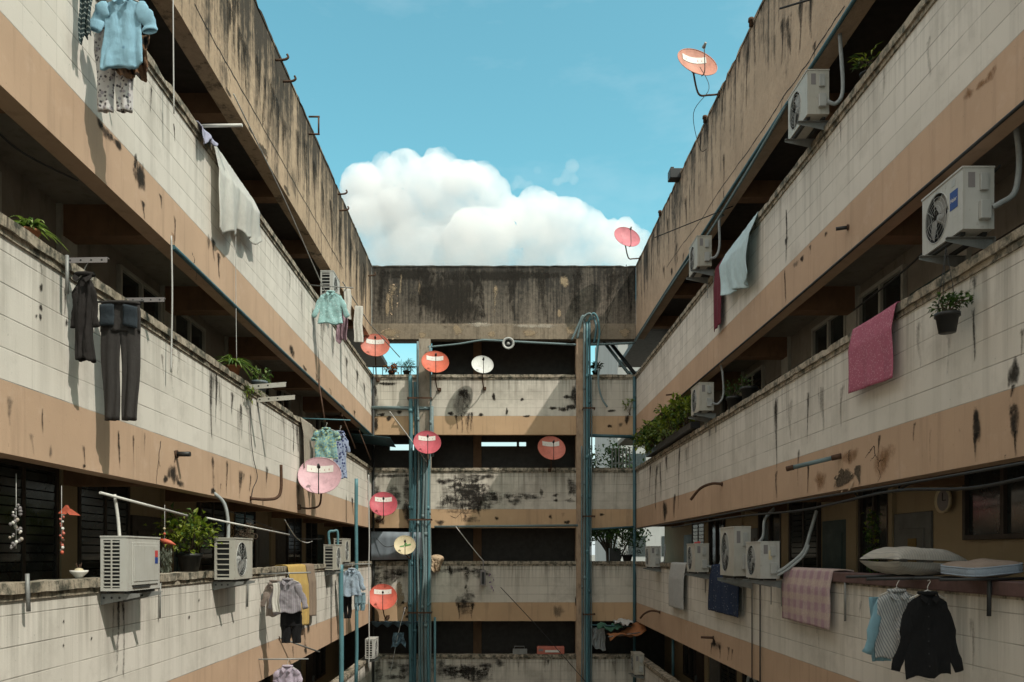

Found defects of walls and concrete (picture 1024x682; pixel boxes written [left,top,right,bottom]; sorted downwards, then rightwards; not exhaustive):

leakage [780,0,812,63]
leakage [700,46,755,144]
leakage [133,156,145,187]
leakage [227,0,365,300]
leakage [378,267,582,324]
leakage [448,389,483,430]
leakage [550,386,576,411]
leakage [972,411,980,452]
leakage [1005,360,1019,456]
leakage [164,451,183,486]
leakage [438,474,576,521]
leakage [431,660,503,682]